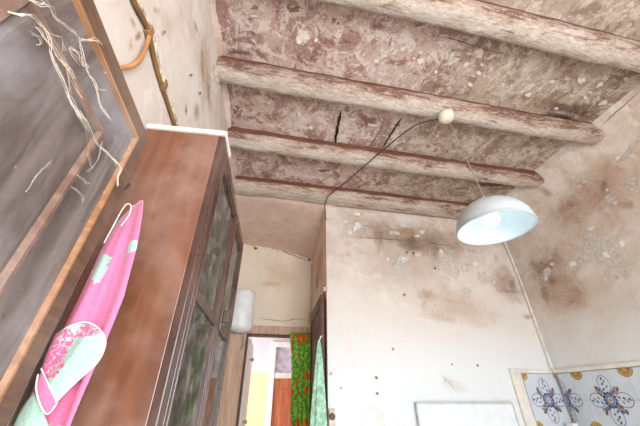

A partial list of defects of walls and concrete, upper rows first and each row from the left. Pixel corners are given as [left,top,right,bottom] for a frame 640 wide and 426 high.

crack [333,111,341,143]
crack [370,118,402,149]